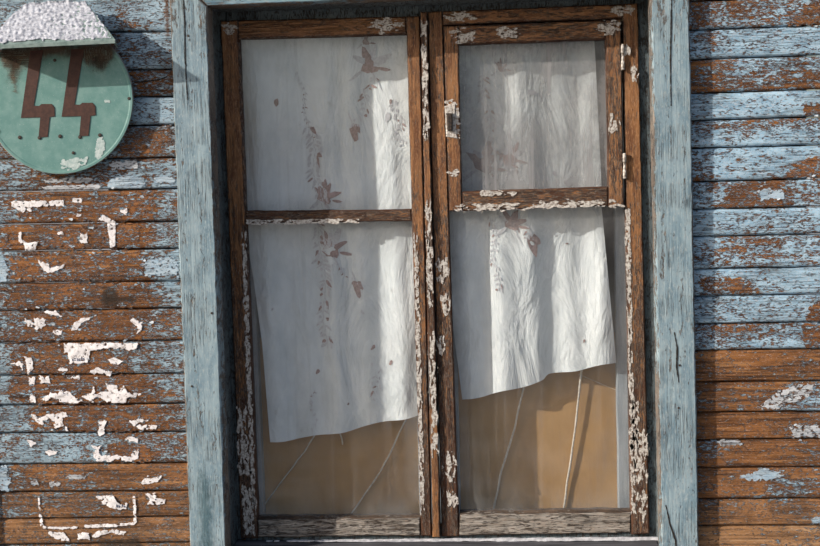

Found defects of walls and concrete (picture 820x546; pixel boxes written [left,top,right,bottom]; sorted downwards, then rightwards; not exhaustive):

peeling [443,11,477,44]
peeling [596,5,635,36]
peeling [787,0,820,27]
peeling [608,113,621,133]
peeling [803,103,820,117]
peeling [724,156,820,208]
peeling [0,137,164,465]
peeling [700,275,747,295]
peeling [413,200,459,515]
peeling [454,190,648,523]
peeling [49,473,86,487]
crack [665,505,677,546]